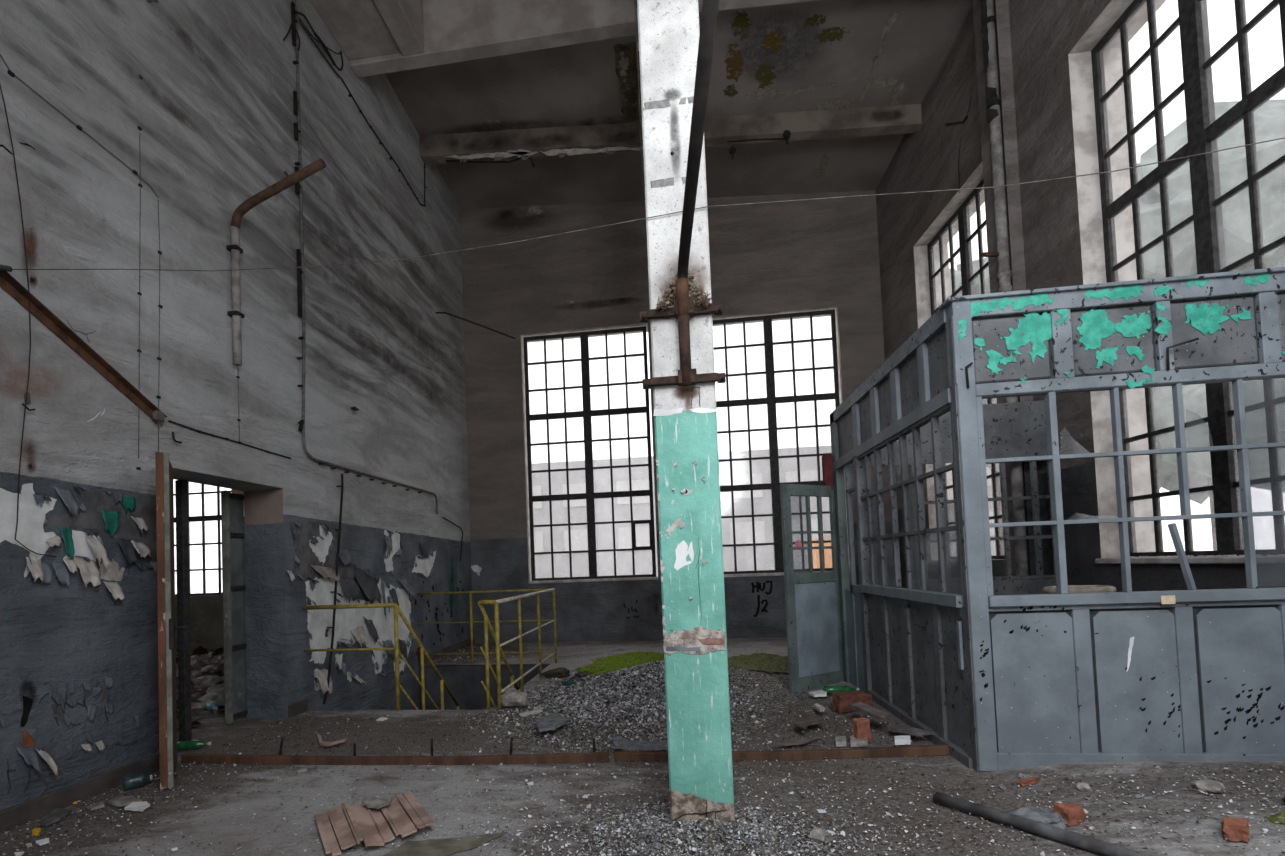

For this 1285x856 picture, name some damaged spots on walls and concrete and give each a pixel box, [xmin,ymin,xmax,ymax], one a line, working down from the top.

damp [724,11,787,97]
damp [805,14,849,43]
spalling [447,146,643,162]
peeling [656,460,706,501]
peeling [0,483,157,600]
peeling [659,518,708,582]
peeling [287,521,550,710]
spalling [662,605,726,656]
spalling [16,683,62,777]